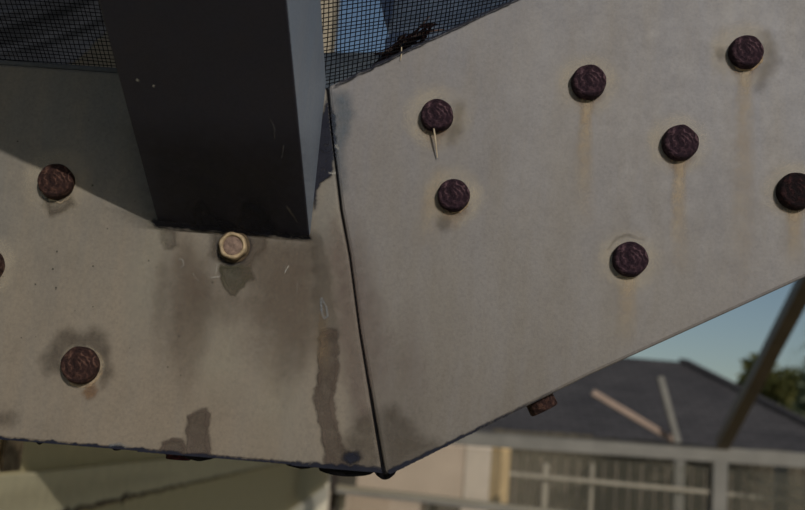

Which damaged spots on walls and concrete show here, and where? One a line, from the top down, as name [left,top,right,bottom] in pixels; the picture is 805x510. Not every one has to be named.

water stain [213,234,266,295]
water stain [314,328,377,467]
water stain [159,408,211,455]
water stain [66,469,252,510]